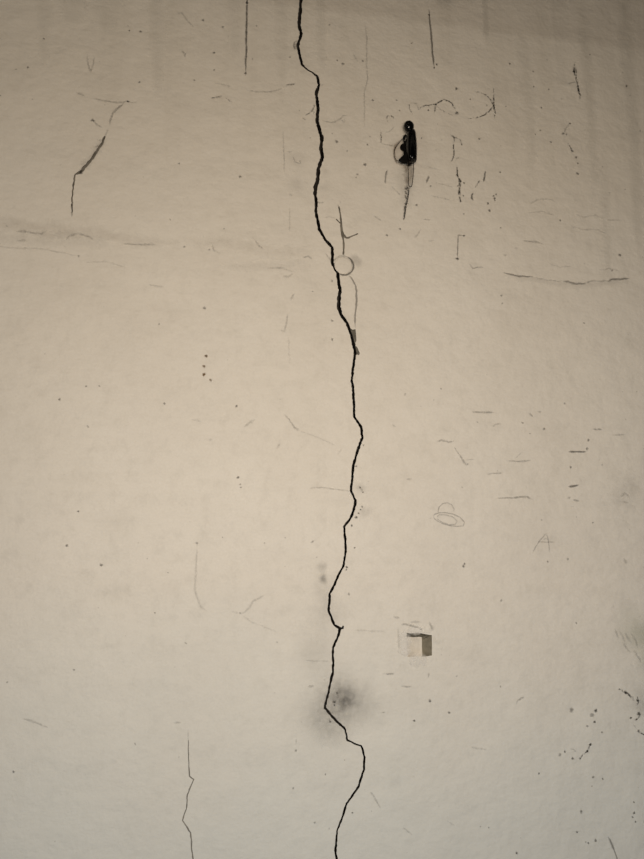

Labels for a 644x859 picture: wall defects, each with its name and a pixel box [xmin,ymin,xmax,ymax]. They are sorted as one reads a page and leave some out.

crack [182,740,194,859]
crack [296,0,366,859]